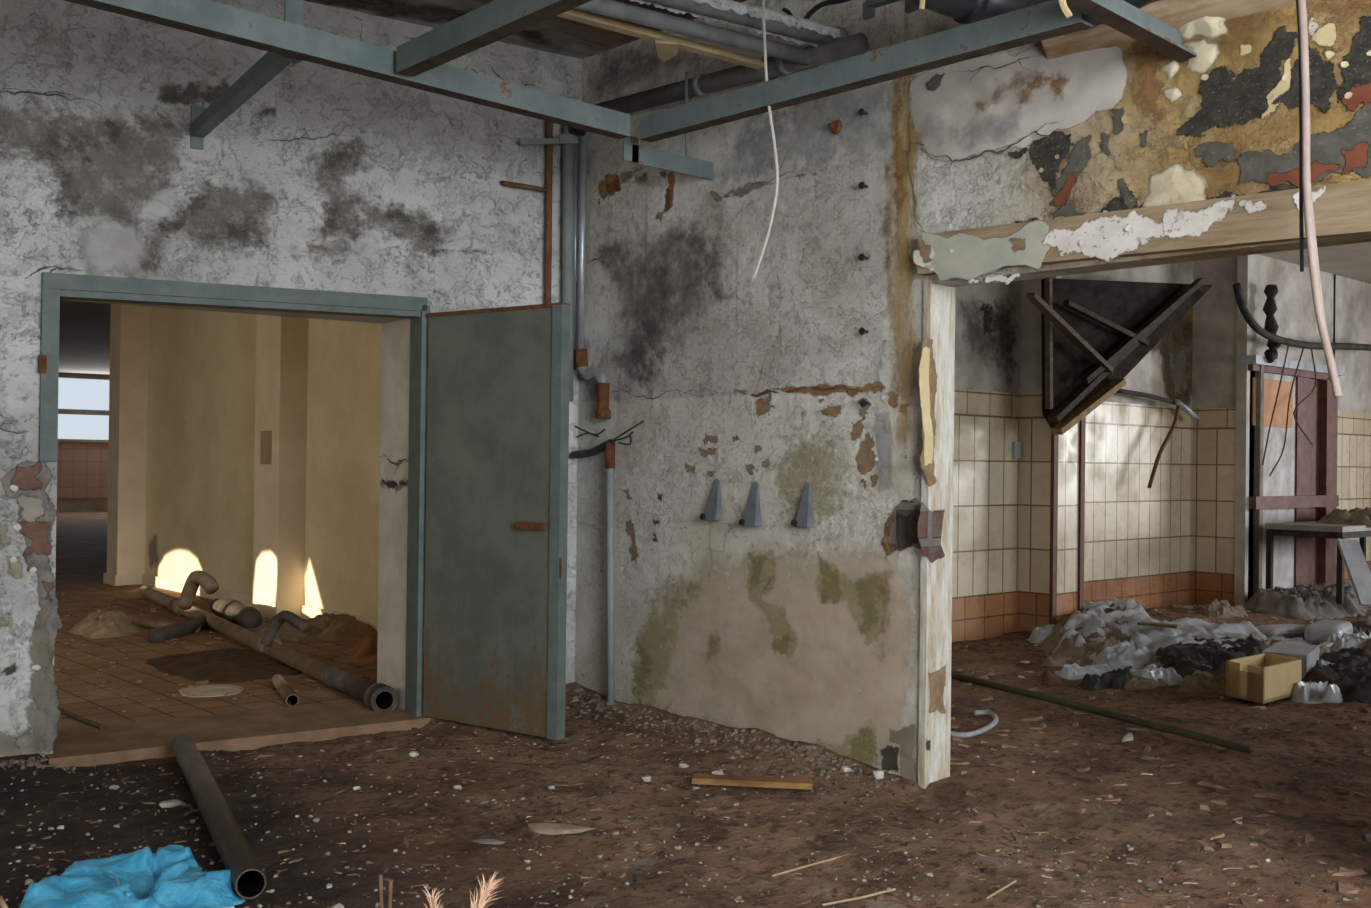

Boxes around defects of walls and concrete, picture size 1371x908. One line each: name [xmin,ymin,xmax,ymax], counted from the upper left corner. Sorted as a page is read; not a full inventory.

crack [0,88,103,108]
water stain [0,80,229,230]
water stain [143,180,276,269]
water stain [309,138,447,254]
peeling [913,16,1371,285]
water stain [607,233,719,379]
rust [739,382,885,397]
peeling [801,337,938,488]
spalling [881,496,945,563]
spalling [0,460,63,755]
water stain [632,553,910,756]
peeling [928,665,946,714]